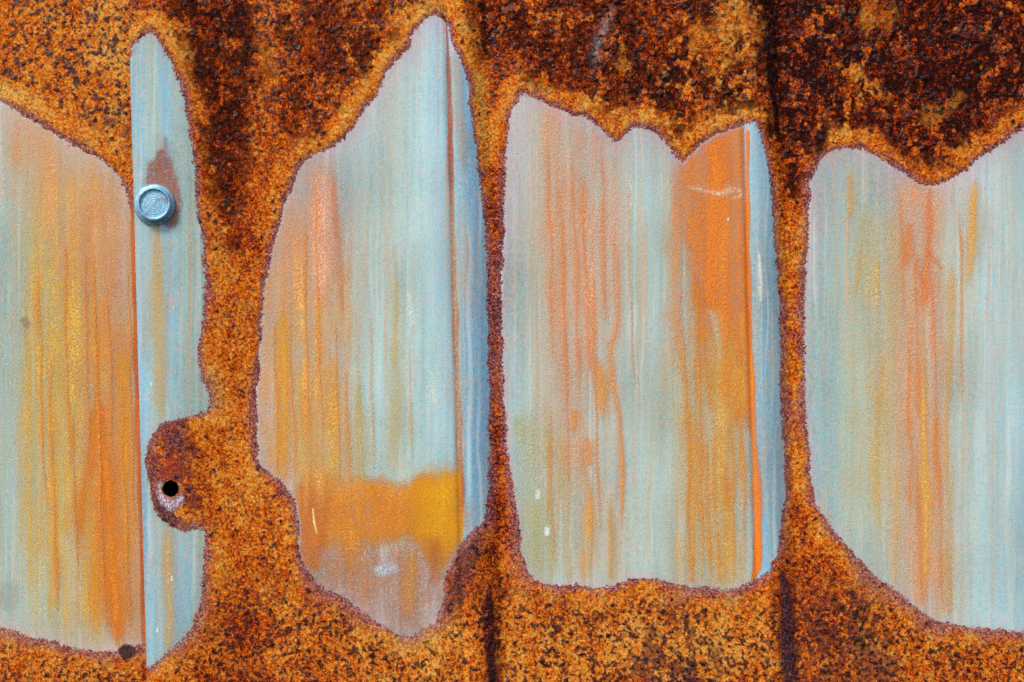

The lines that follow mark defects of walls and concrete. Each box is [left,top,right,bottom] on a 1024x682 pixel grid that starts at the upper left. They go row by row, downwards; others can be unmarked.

corrosion [10,123,195,659]
corrosion [168,0,413,247]
corrosion [258,25,482,629]
corrosion [516,113,632,578]
corrosion [671,127,762,580]
corrosion [477,0,1024,197]
corrosion [864,183,978,608]
corrosion [482,584,497,682]
corrosion [632,627,720,682]
corrosion [779,571,898,682]